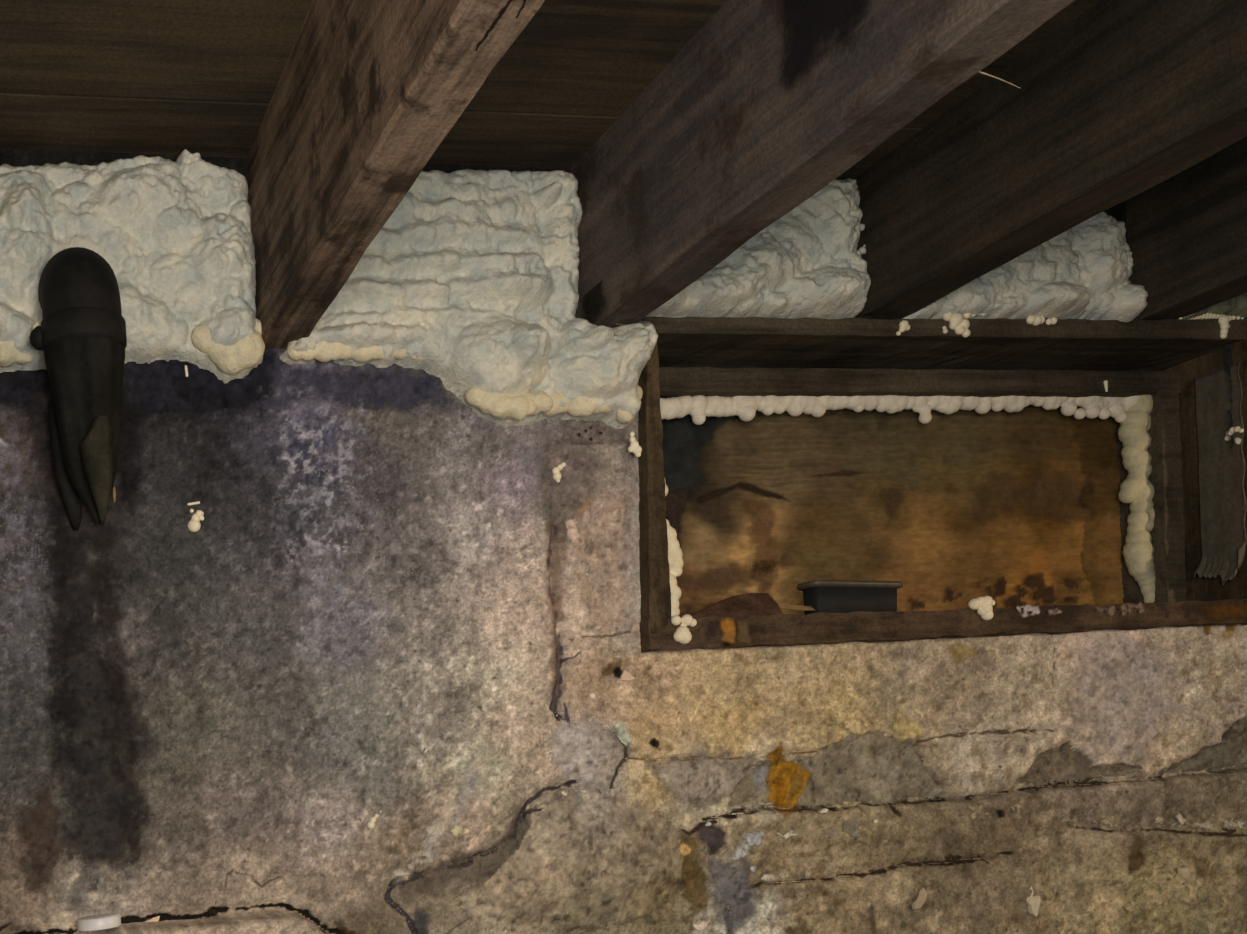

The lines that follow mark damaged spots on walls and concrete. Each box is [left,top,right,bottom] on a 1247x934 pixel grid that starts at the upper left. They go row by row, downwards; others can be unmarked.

water stain [0,394,151,913]
crack [385,524,743,934]
spalling [1159,717,1247,774]
corrosion [765,747,811,816]
crack [683,765,1247,837]
crack [0,923,77,934]
crack [121,870,345,934]
crack [751,851,1013,888]